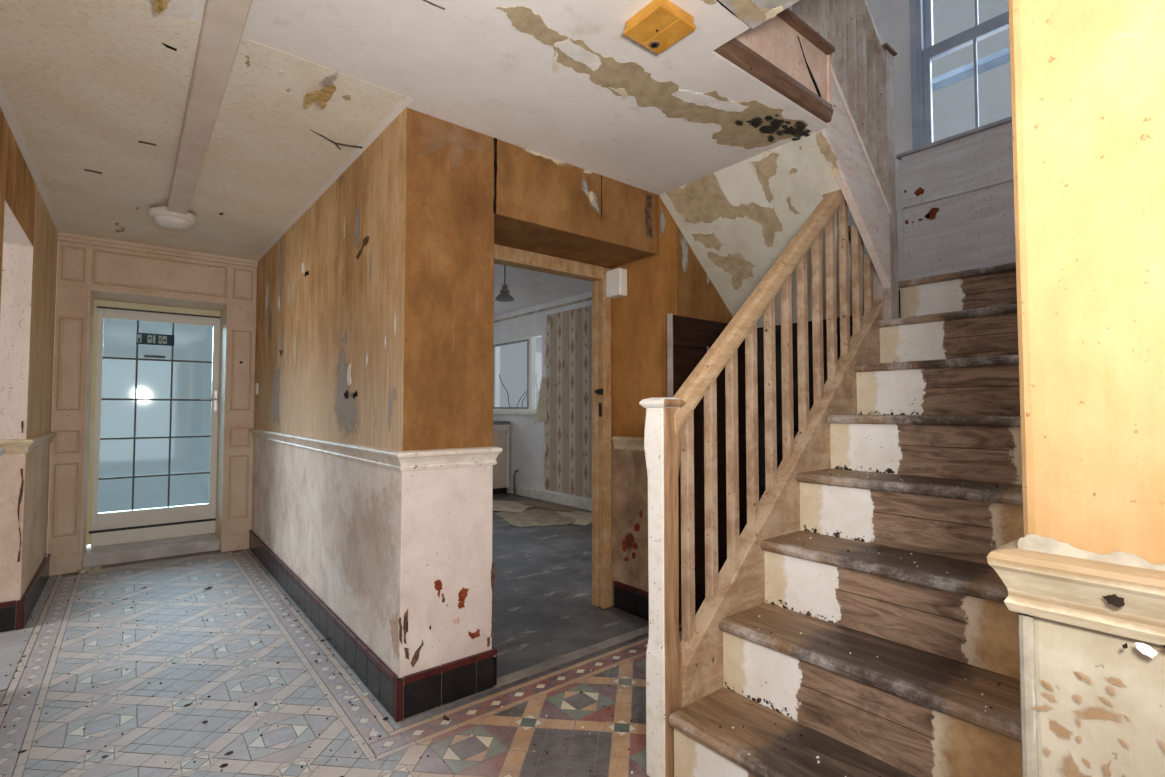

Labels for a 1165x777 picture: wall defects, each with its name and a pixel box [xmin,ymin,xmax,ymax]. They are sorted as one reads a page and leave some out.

peeling [305,76,351,109]
peeling [495,6,838,290]
water stain [734,114,810,142]
corrosion [905,208,939,224]
peeling [265,238,297,424]
peeling [335,332,358,433]
corrosion [622,510,643,562]
corrosion [434,580,469,609]
spalling [390,615,402,657]
peeling [1034,671,1129,742]
peeling [1063,757,1111,777]